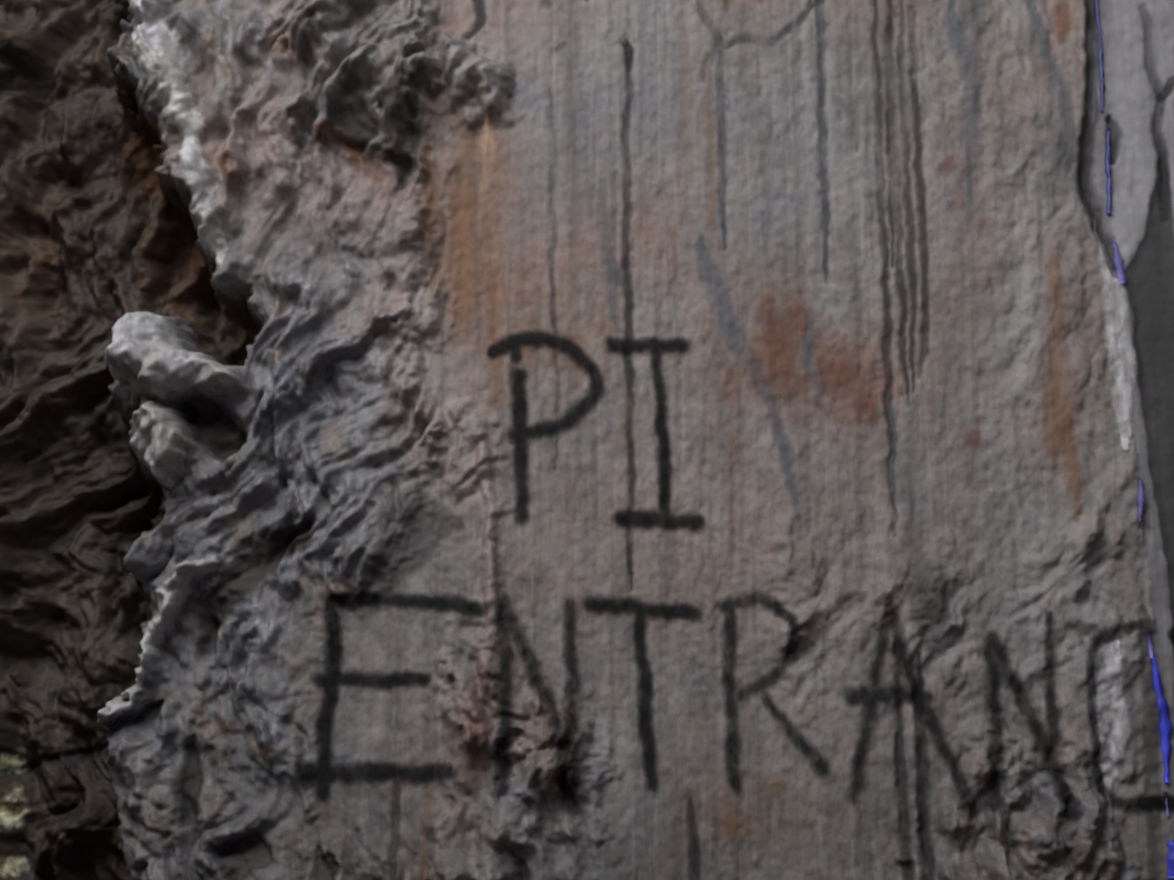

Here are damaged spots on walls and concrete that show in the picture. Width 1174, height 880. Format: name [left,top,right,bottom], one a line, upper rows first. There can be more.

crack [1078,0,1118,277]